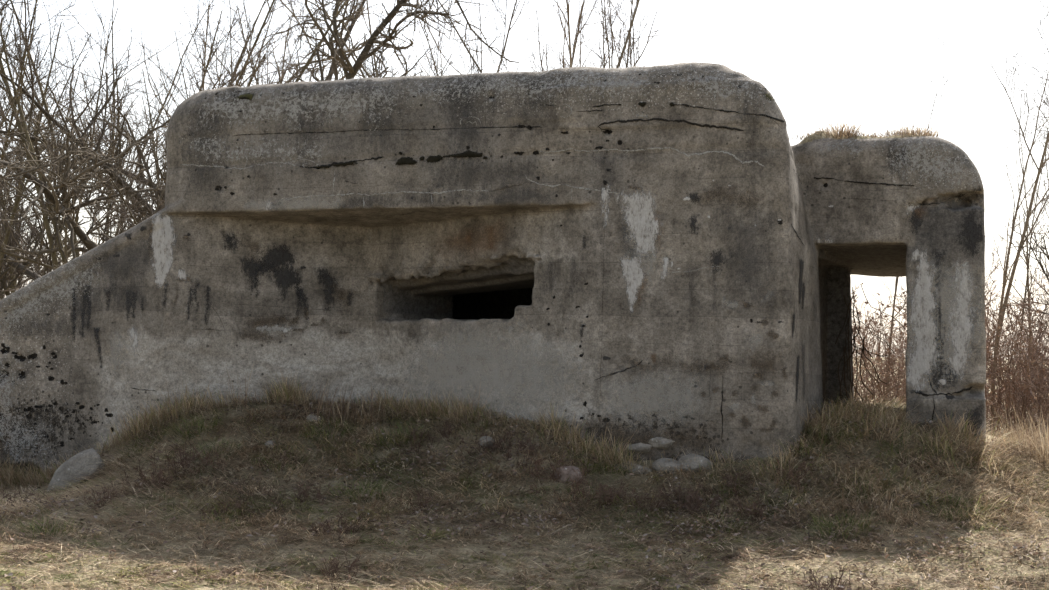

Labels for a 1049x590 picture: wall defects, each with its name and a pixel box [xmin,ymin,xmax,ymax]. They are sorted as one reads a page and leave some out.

damp [125,214,212,325]
damp [221,229,356,318]
crack [182,104,784,208]
damp [601,169,659,311]
crack [793,169,915,186]
spalling [906,188,984,214]
damp [71,282,103,368]
crack [911,372,972,421]